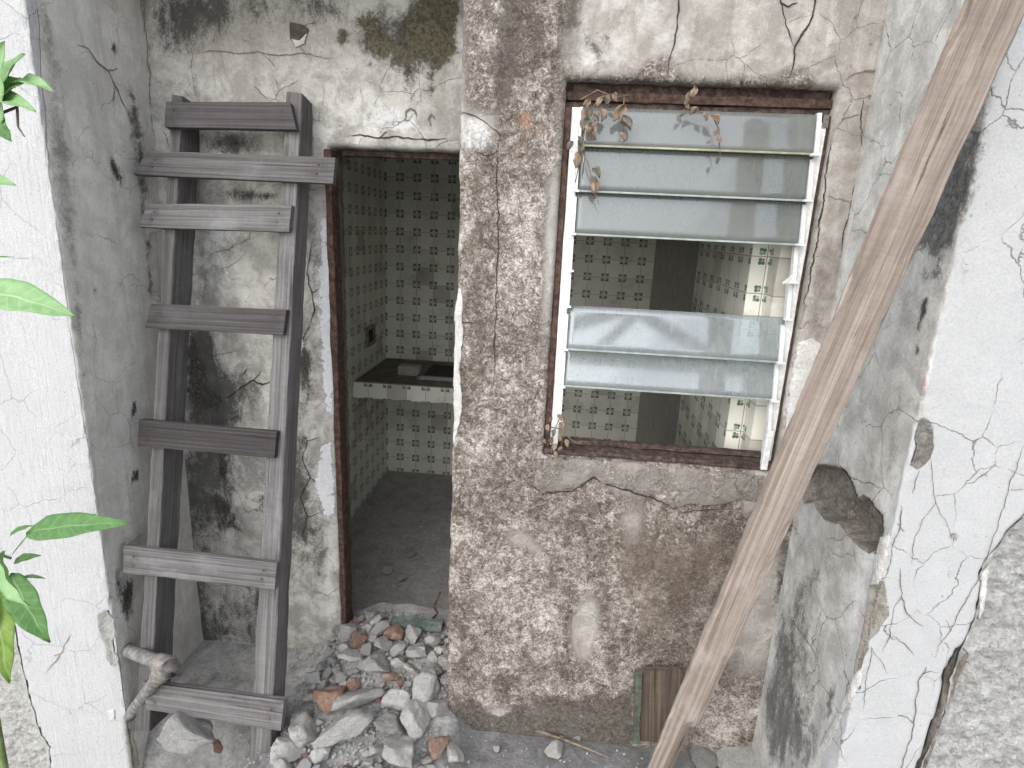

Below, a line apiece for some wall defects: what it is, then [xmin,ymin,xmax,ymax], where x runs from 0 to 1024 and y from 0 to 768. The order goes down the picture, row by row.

flaking render [289,22,309,47]
damp [337,0,459,96]
crack [780,0,816,75]
crack [346,108,451,141]
damp [919,106,984,261]
crack [461,112,501,385]
damp [187,336,222,414]
flaking render [911,419,934,469]
damp [210,493,241,533]
crack [531,477,715,513]
flaking render [803,464,890,712]
crack [863,451,1022,768]